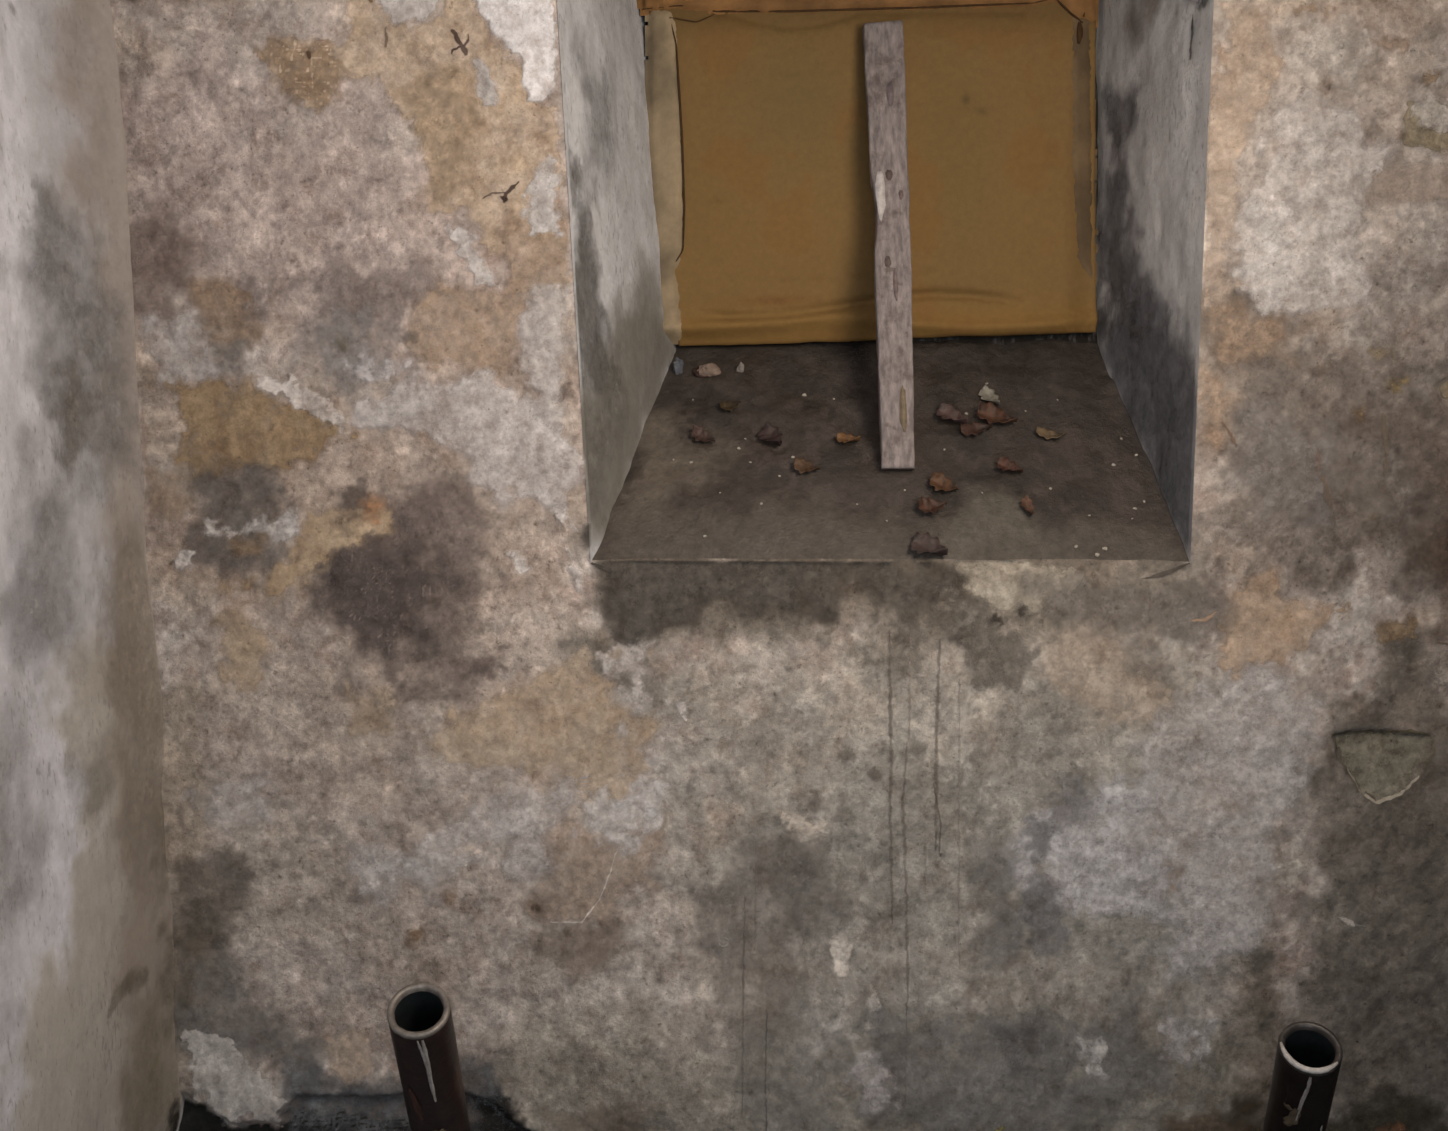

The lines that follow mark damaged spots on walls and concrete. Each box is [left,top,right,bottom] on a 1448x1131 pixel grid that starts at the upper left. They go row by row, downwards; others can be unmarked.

flaking render [142,0,585,528]
water stain [315,481,490,699]
spalling [507,551,529,574]
water stain [598,561,1040,761]
water stain [584,773,667,854]
water stain [870,671,959,858]
water stain [970,572,1323,979]
flaking render [1332,729,1434,804]
flaking render [169,1029,411,1131]
flaking render [460,1058,528,1131]